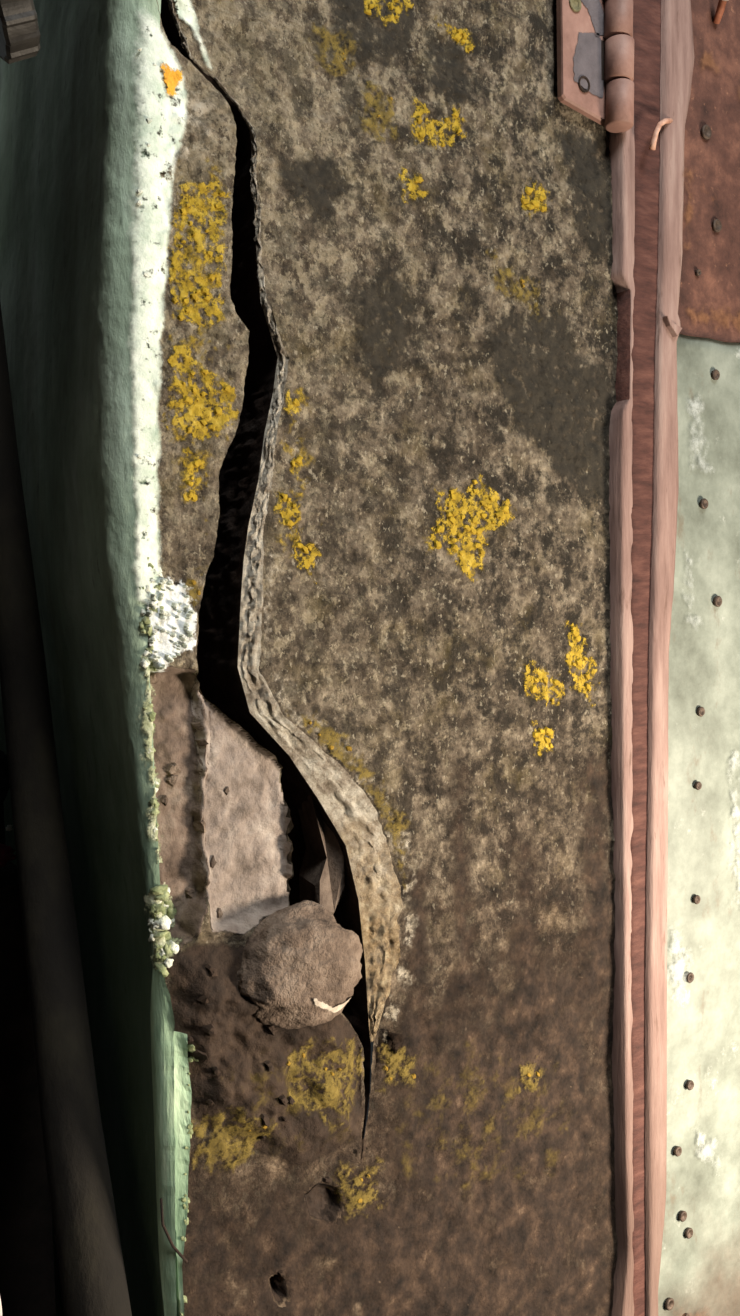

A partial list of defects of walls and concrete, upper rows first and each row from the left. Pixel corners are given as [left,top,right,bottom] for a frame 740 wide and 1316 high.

water stain [146,577,197,672]
crack [160,0,413,1145]